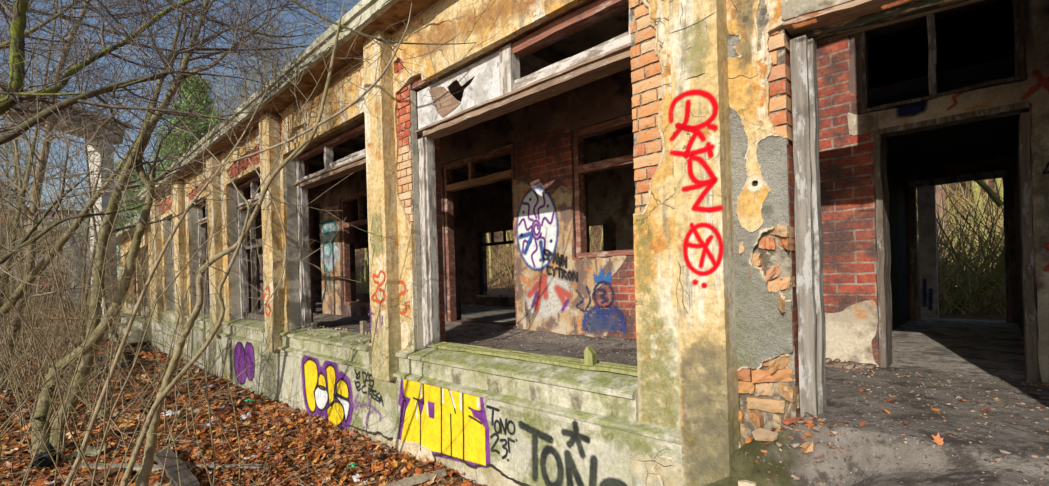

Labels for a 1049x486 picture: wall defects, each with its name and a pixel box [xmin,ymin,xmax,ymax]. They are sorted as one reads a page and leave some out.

spalling [393,56,422,228]
spalling [629,0,665,215]
peeling [727,0,800,448]
water stain [682,347,729,486]